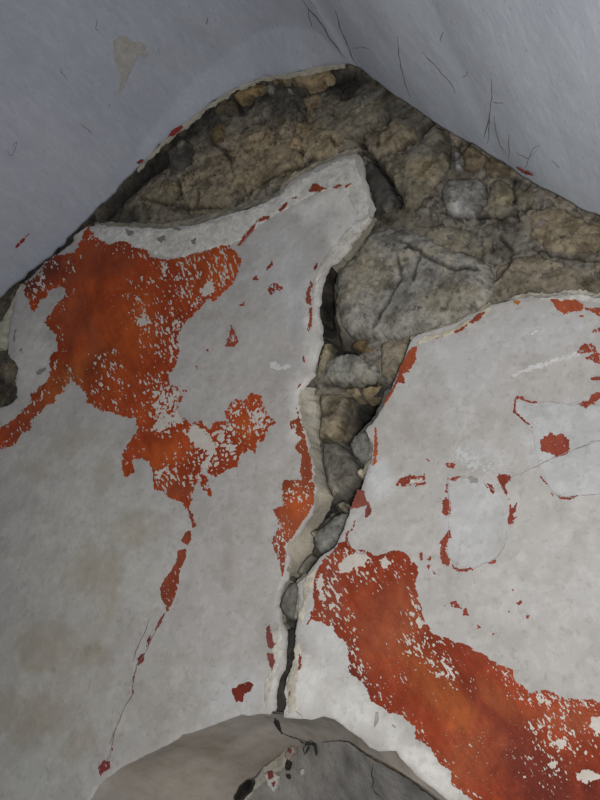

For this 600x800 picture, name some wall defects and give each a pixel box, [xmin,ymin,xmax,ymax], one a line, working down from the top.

crack [305,4,368,66]
crack [484,79,539,168]
spalling [0,64,600,671]
crack [264,385,437,800]
peeling [98,760,110,776]